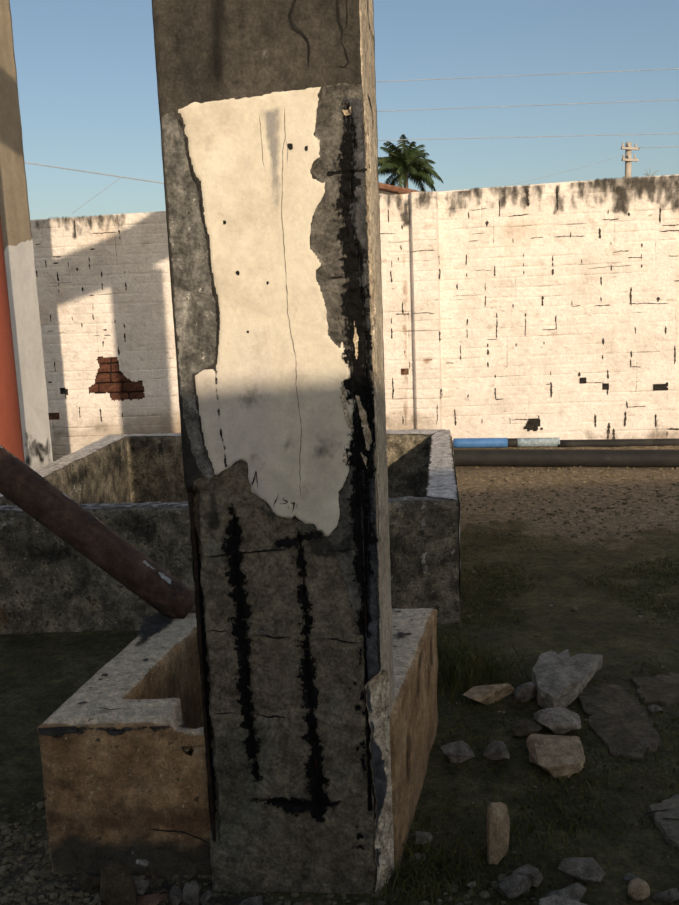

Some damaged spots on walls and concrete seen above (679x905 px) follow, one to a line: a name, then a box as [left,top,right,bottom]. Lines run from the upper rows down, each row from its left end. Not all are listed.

crack [288,0,310,67]
leakage [57,214,124,228]
leakage [379,195,409,225]
leakage [447,185,542,211]
leakage [554,175,679,214]
spalling [89,356,145,401]
peeling [26,433,50,465]
spalling [161,83,395,894]
spalling [38,726,169,738]